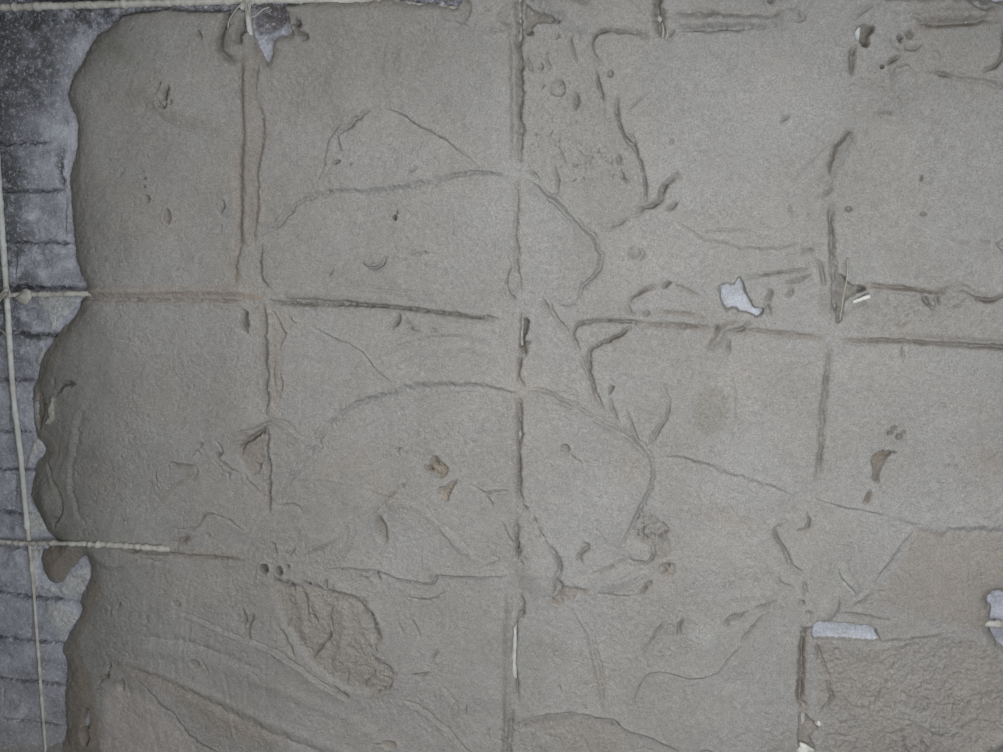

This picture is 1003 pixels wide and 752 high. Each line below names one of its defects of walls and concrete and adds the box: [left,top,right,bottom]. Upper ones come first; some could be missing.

spalling [859,27,872,48]
spalling [721,278,763,315]
crack [540,279,706,449]
peeling [27,490,47,533]
crack [470,482,510,508]
peeling [27,545,44,588]
spalling [812,621,879,640]
peeling [797,742,815,752]